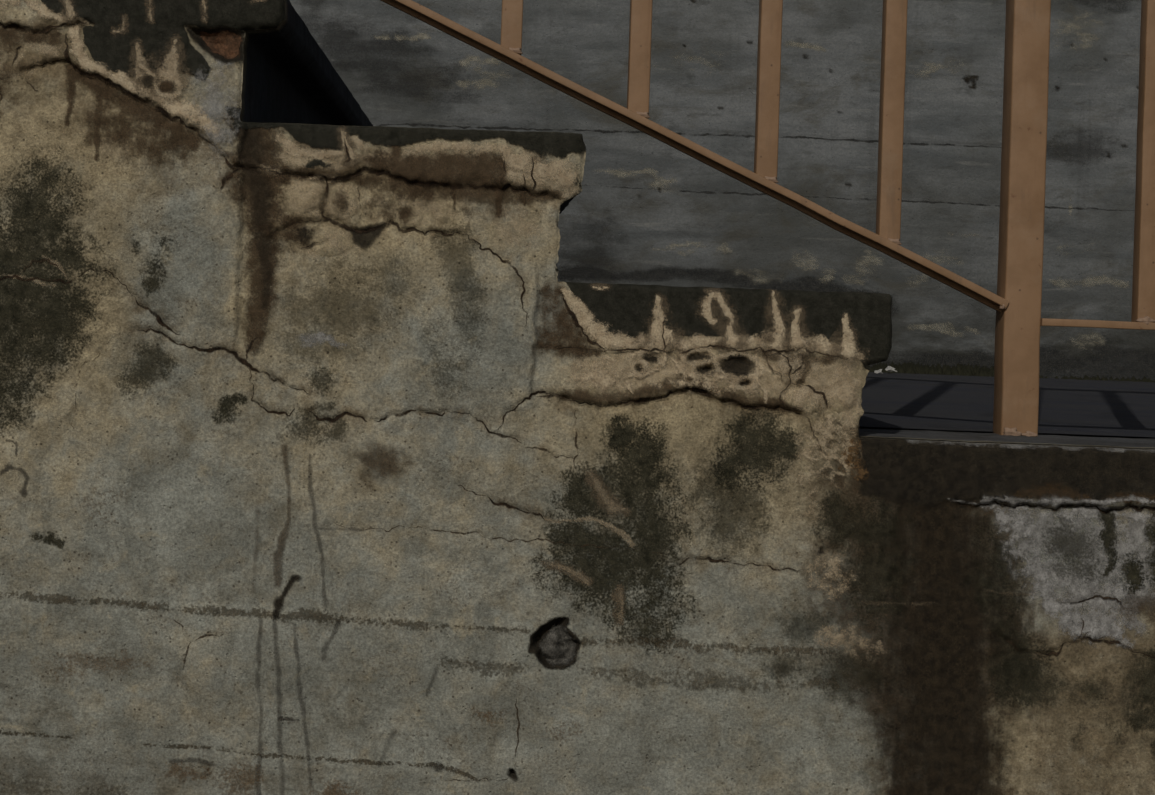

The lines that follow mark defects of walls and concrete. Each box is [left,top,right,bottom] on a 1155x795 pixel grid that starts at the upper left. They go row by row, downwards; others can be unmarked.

peeling [41,0,285,80]
water stain [0,0,577,354]
peeling [225,105,586,186]
crack [0,21,853,470]
water stain [0,156,115,495]
spalling [636,353,660,374]
spalling [688,353,755,387]
peeling [555,268,892,370]
water stain [533,266,1155,795]
crack [996,595,1155,658]